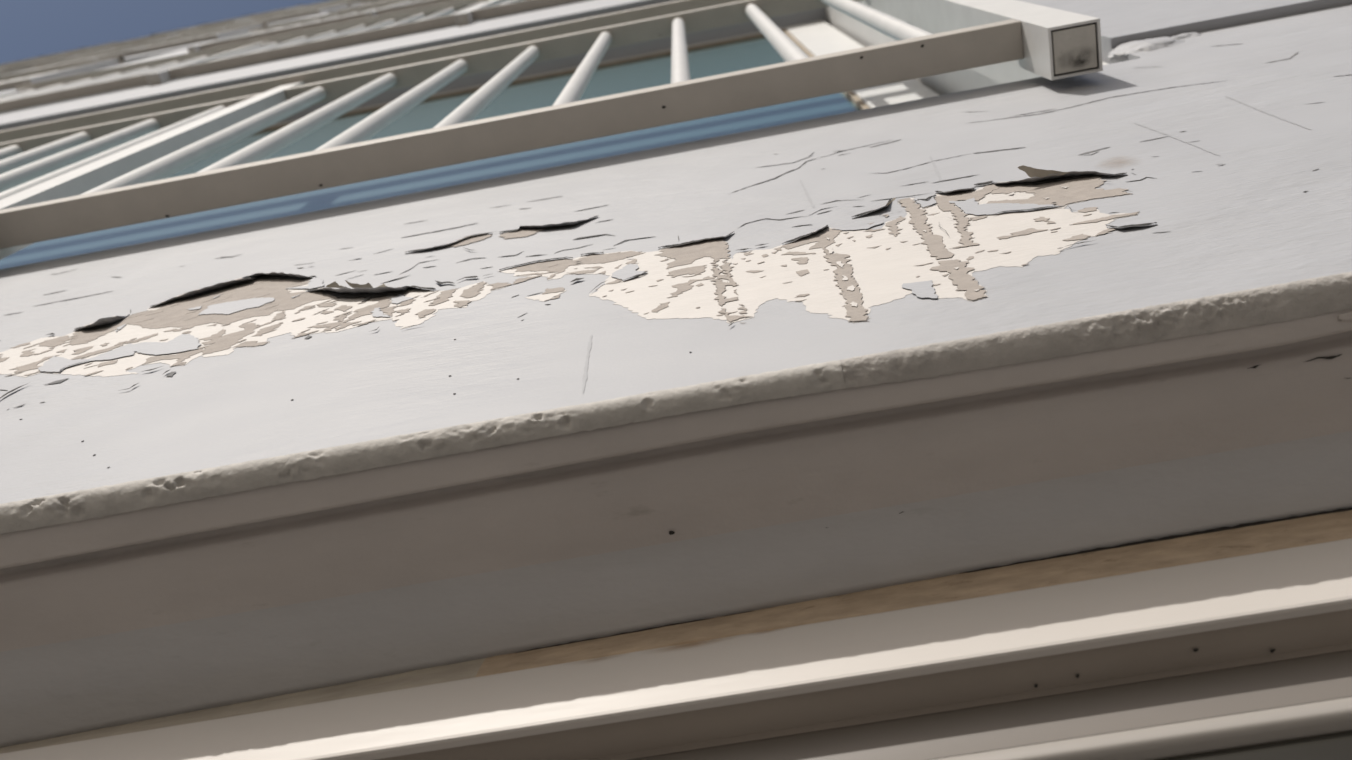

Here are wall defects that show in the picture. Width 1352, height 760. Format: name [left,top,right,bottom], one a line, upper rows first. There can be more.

peeling [0,165,1158,408]
spalling [0,272,1352,534]
crack [1305,354,1350,379]